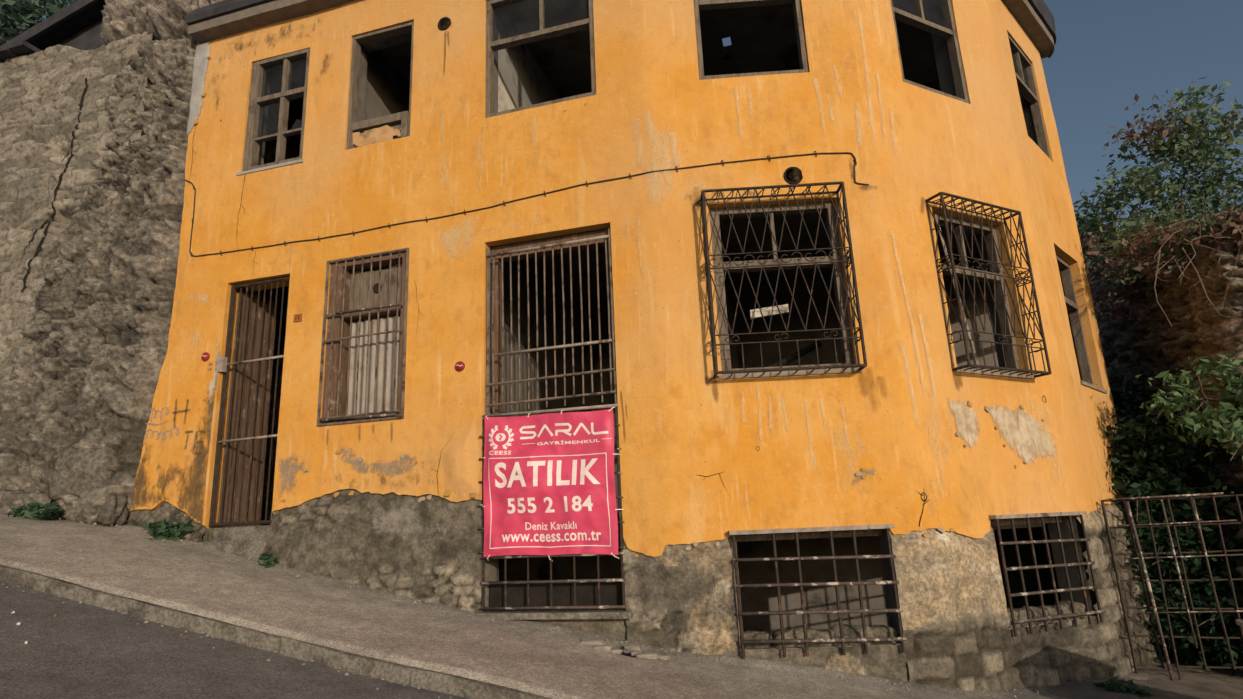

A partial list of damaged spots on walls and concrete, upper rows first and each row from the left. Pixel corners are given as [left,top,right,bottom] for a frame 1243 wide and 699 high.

crack [21,78,88,292]
peeling [335,448,418,475]
peeling [270,457,483,612]
peeling [948,398,1057,464]